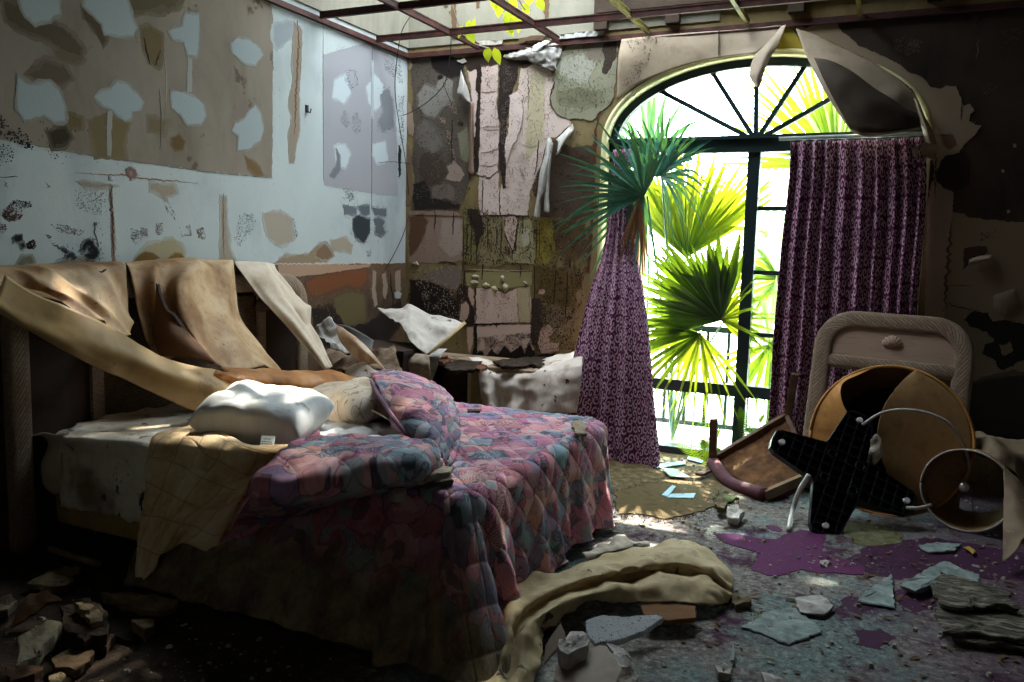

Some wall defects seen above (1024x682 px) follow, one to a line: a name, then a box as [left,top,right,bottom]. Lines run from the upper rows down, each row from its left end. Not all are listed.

peeling [0,5,54,151]
leakage [0,179,120,273]
peeling [54,0,276,185]
leakage [306,36,604,359]
flaking render [459,286,559,356]
flaking render [406,35,619,265]
peeling [796,8,1024,222]
peeling [968,255,992,265]
peeling [963,306,1024,371]